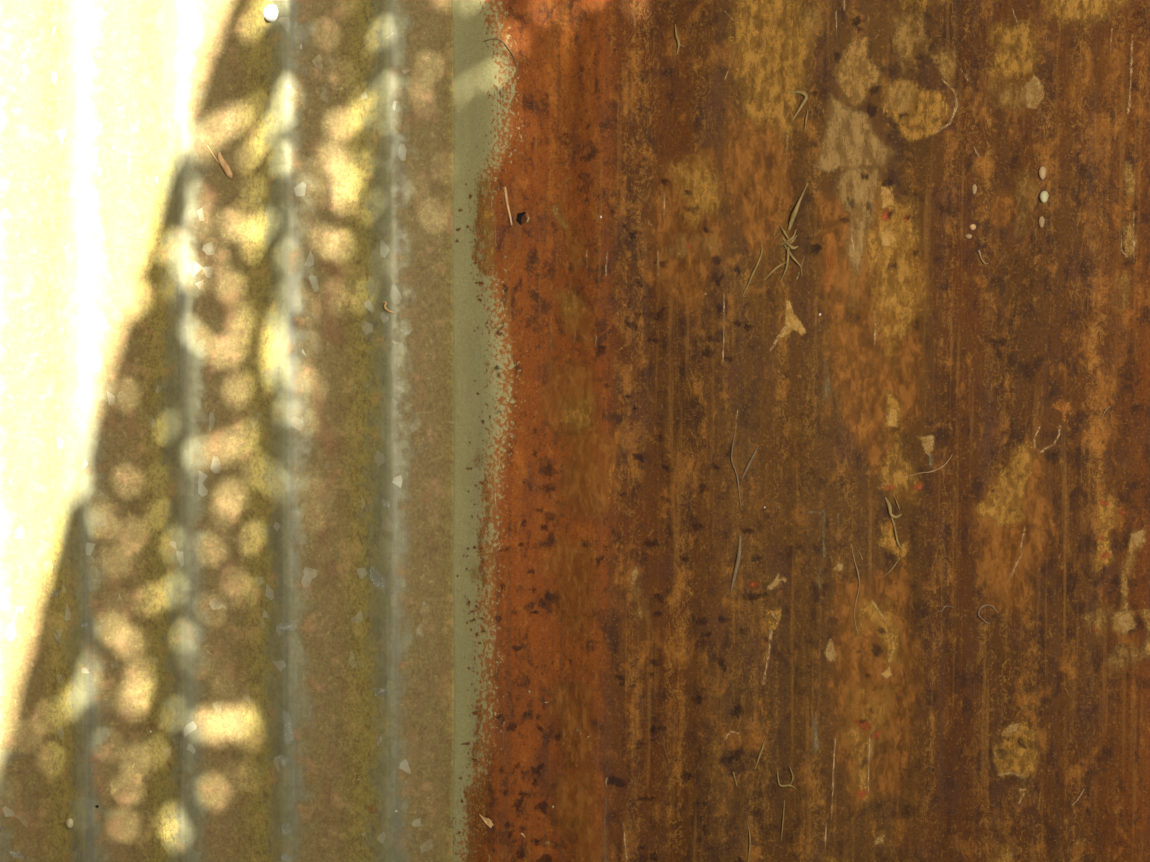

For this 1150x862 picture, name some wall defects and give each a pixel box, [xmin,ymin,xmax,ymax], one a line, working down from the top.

corrosion [453,0,1150,862]